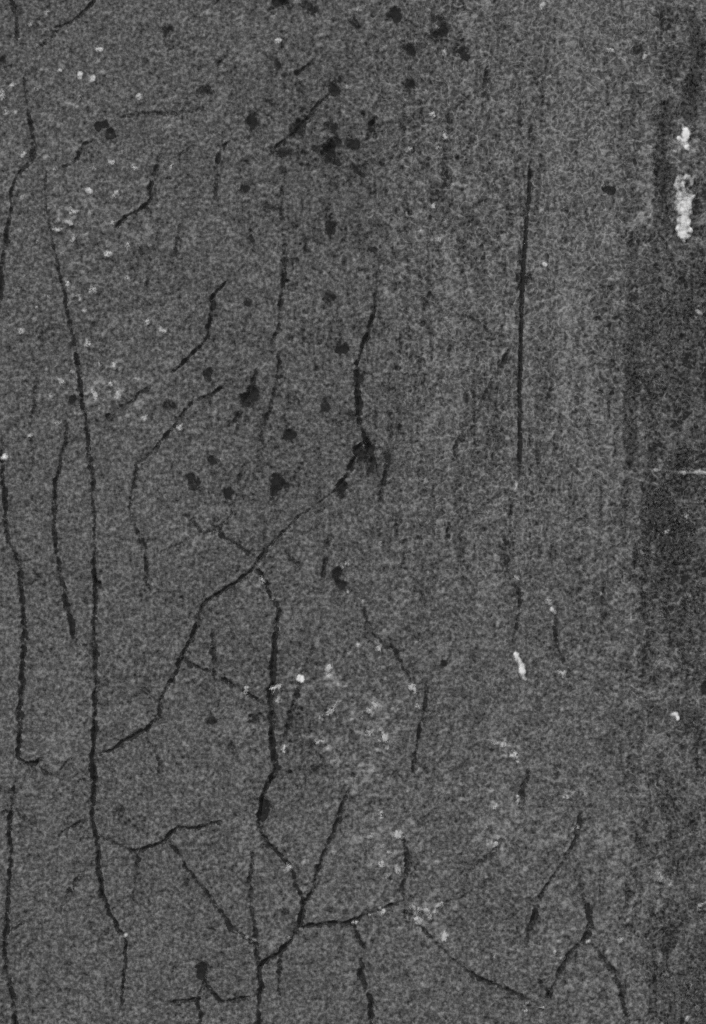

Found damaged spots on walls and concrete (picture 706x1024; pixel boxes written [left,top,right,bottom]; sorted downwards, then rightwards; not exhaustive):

crack [0,77,37,299]
crack [0,134,631,1024]